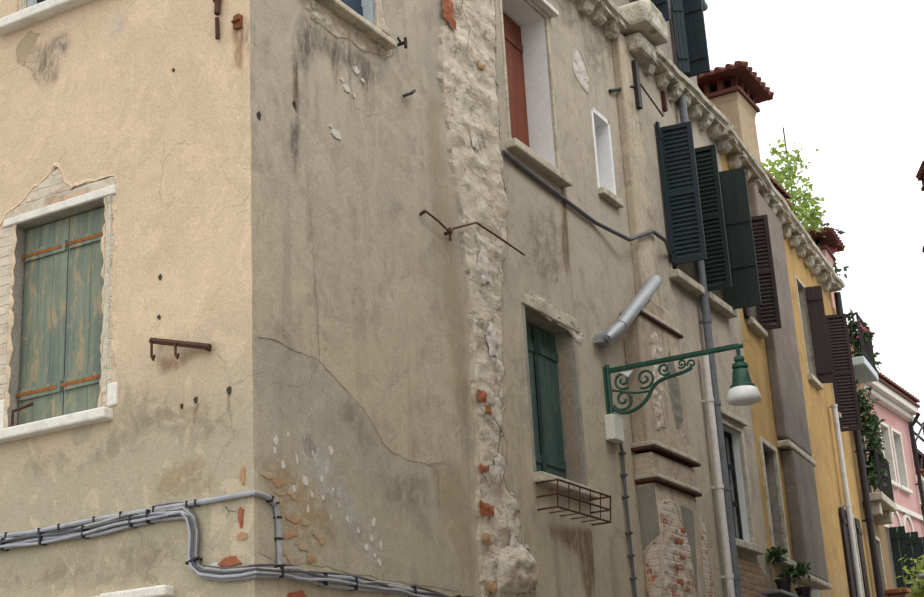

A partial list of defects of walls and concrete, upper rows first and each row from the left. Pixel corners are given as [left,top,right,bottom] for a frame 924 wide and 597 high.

spalling [0,162,119,428]
spalling [436,0,536,597]
peeling [261,431,334,565]
crack [258,337,447,519]
peeling [330,501,382,567]
spalling [644,498,716,597]